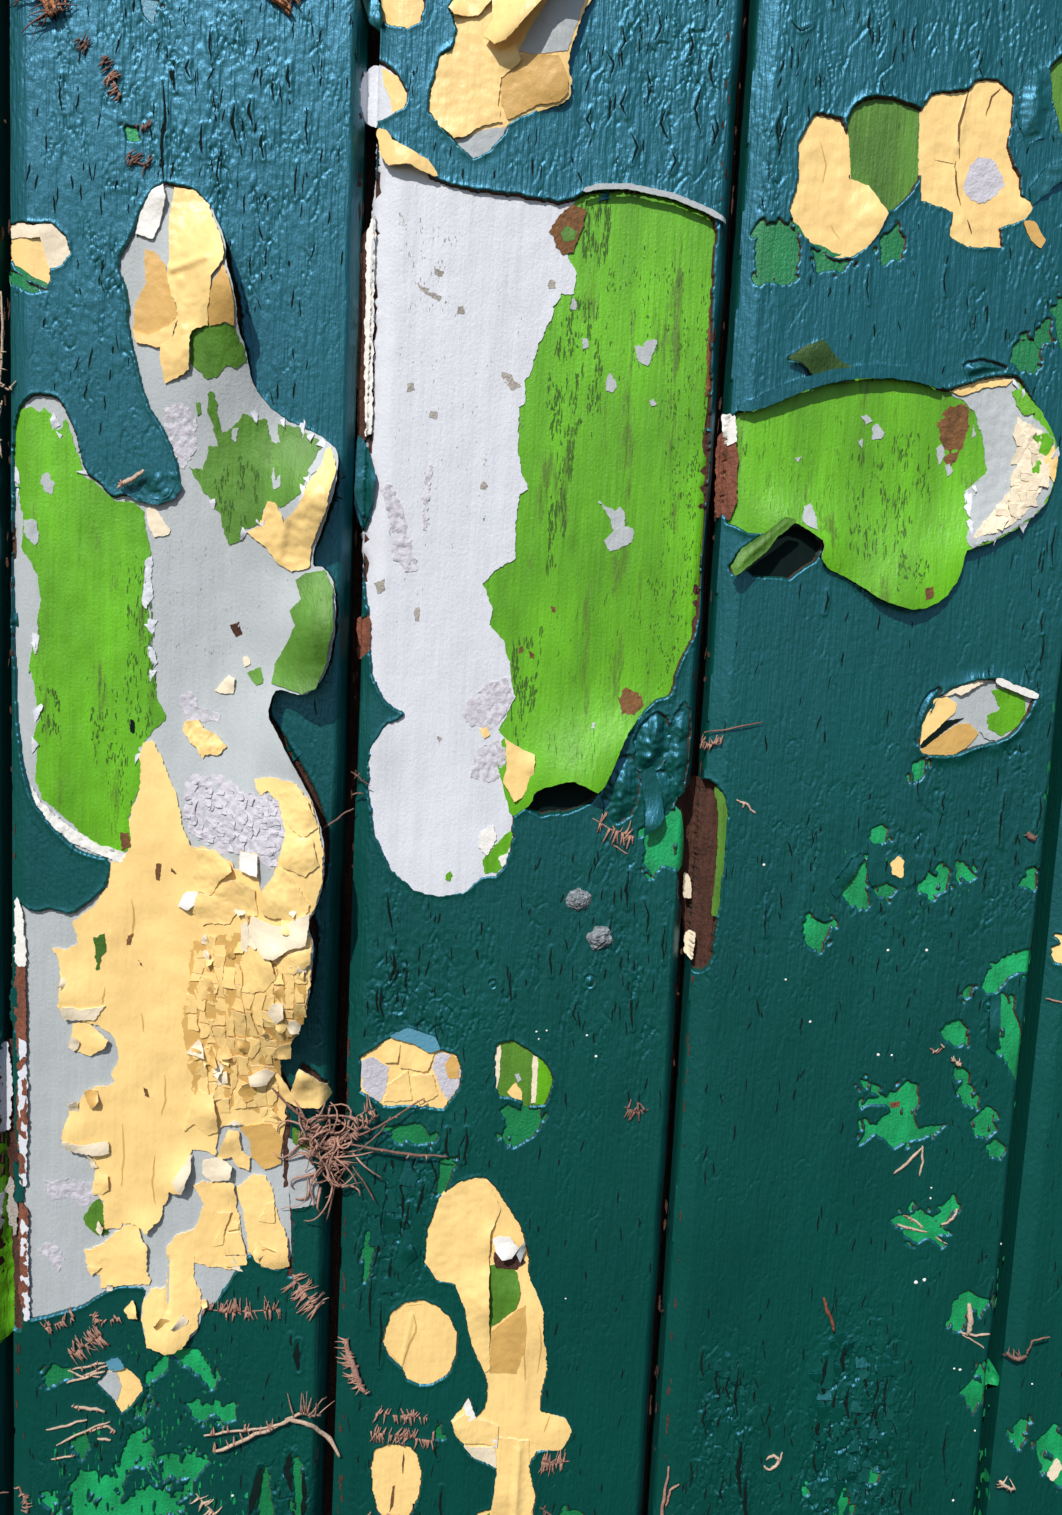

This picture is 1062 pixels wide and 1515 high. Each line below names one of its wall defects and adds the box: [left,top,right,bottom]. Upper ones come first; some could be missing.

crack [54,333,129,435]
crack [26,0,357,405]
peeling [379,0,424,28]
peeling [429,0,591,158]
peeling [356,59,1062,916]
crack [761,0,917,211]
peeling [0,184,338,1515]
crack [214,1276,370,1515]
peeling [360,1038,571,1515]
crack [354,805,667,1367]
spalling [683,930,695,960]
crack [703,527,1056,1187]